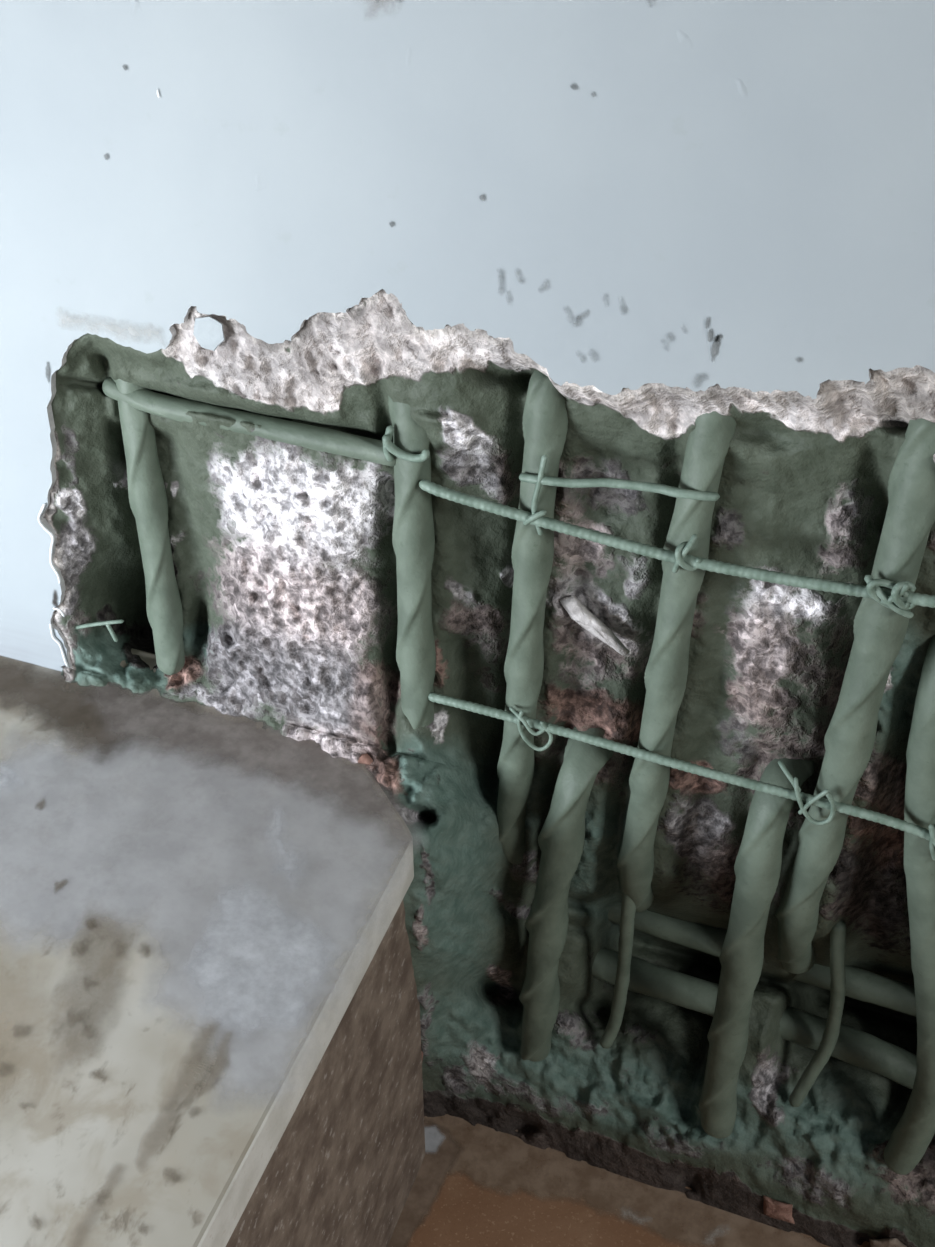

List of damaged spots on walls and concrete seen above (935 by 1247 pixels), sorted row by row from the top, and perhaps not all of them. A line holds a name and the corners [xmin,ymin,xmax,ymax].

water stain [0,736,398,1089]
spalling [38,289,935,1247]